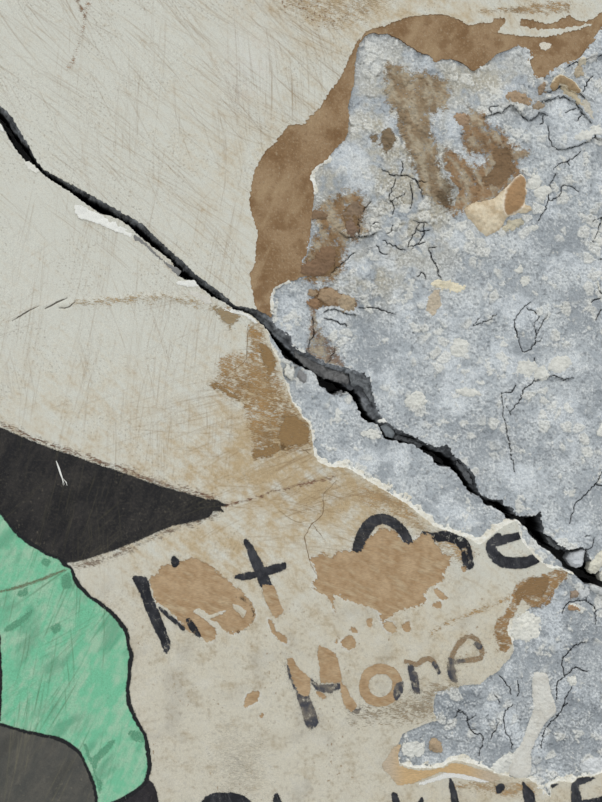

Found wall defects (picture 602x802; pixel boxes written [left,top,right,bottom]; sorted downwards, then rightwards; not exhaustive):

crack [488,54,602,221]
crack [0,106,599,621]
spalling [249,12,602,797]
peeling [149,557,256,642]
peeling [244,691,260,708]